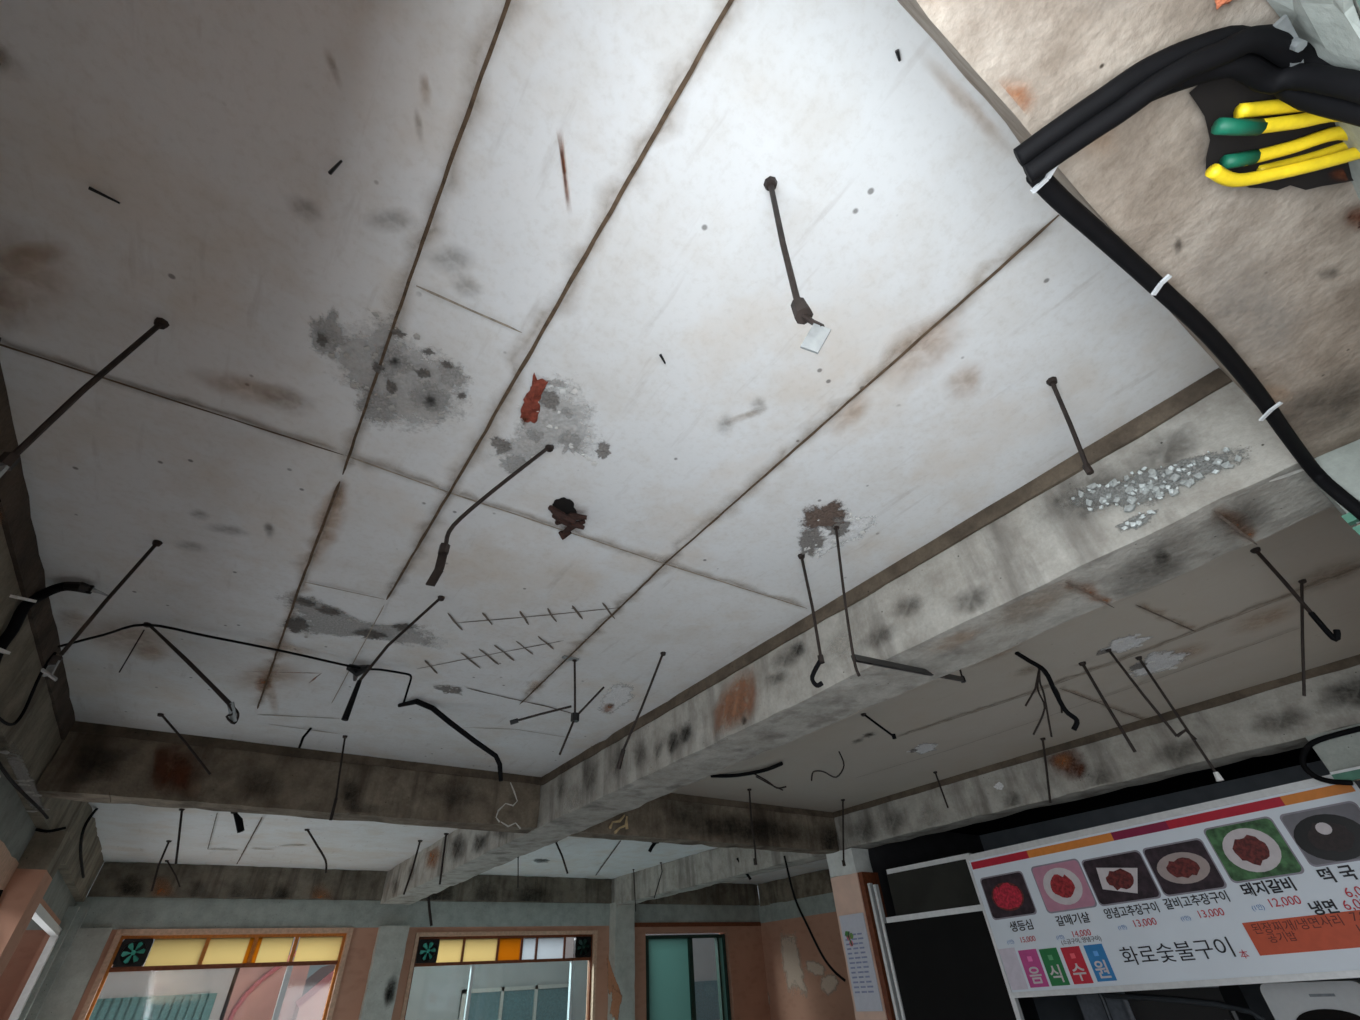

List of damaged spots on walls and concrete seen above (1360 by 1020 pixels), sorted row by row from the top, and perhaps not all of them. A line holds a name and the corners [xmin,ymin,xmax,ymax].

spalling [310,312,466,422]
spalling [491,373,611,473]
spalling [799,501,876,557]
spalling [1071,447,1248,531]